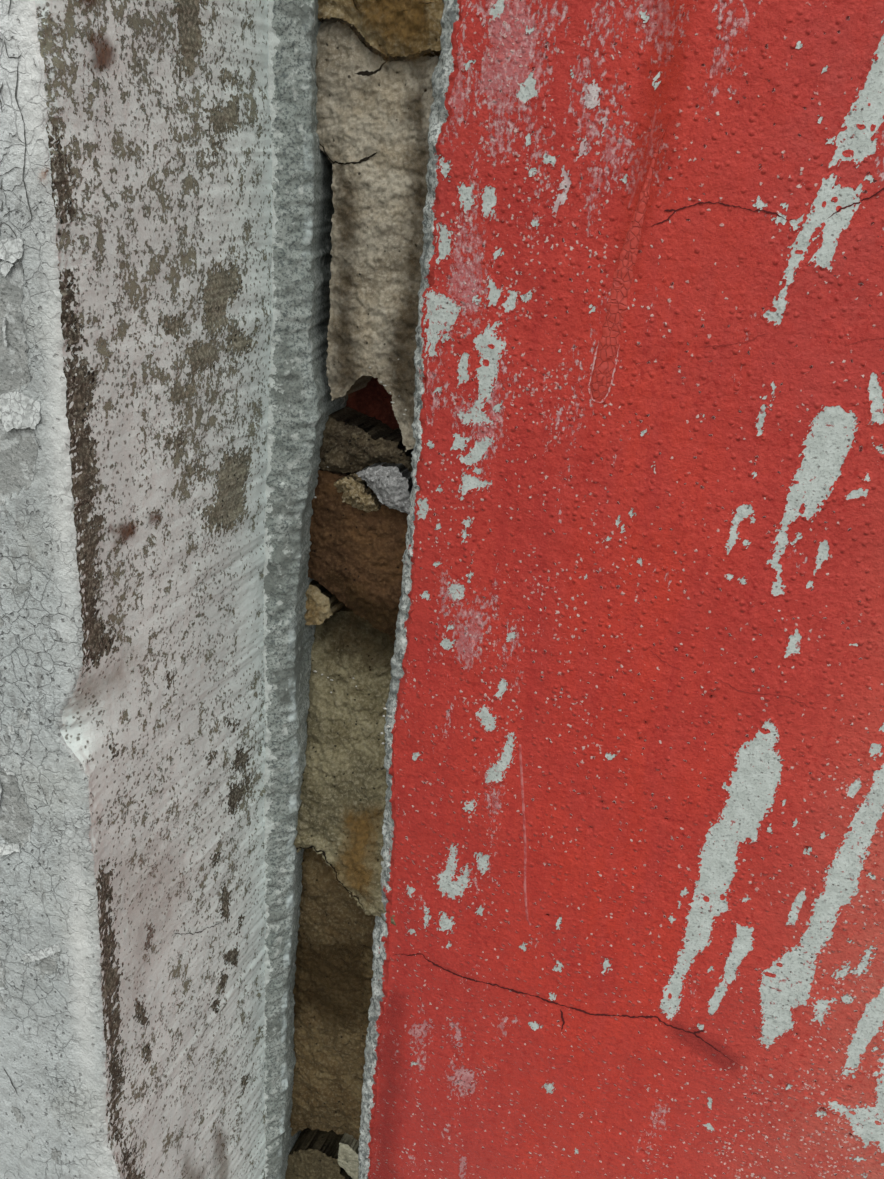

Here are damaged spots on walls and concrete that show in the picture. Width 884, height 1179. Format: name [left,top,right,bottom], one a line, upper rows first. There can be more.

crack [318,0,436,76]
peeling [528,66,608,214]
crack [650,201,793,227]
crack [826,187,884,220]
peeling [0,233,41,506]
peeling [414,273,532,532]
peeling [763,369,884,598]
peeling [460,679,519,816]
peeling [404,841,492,949]
crack [390,953,736,1063]
peeling [657,716,786,1030]
peeling [755,723,884,1178]